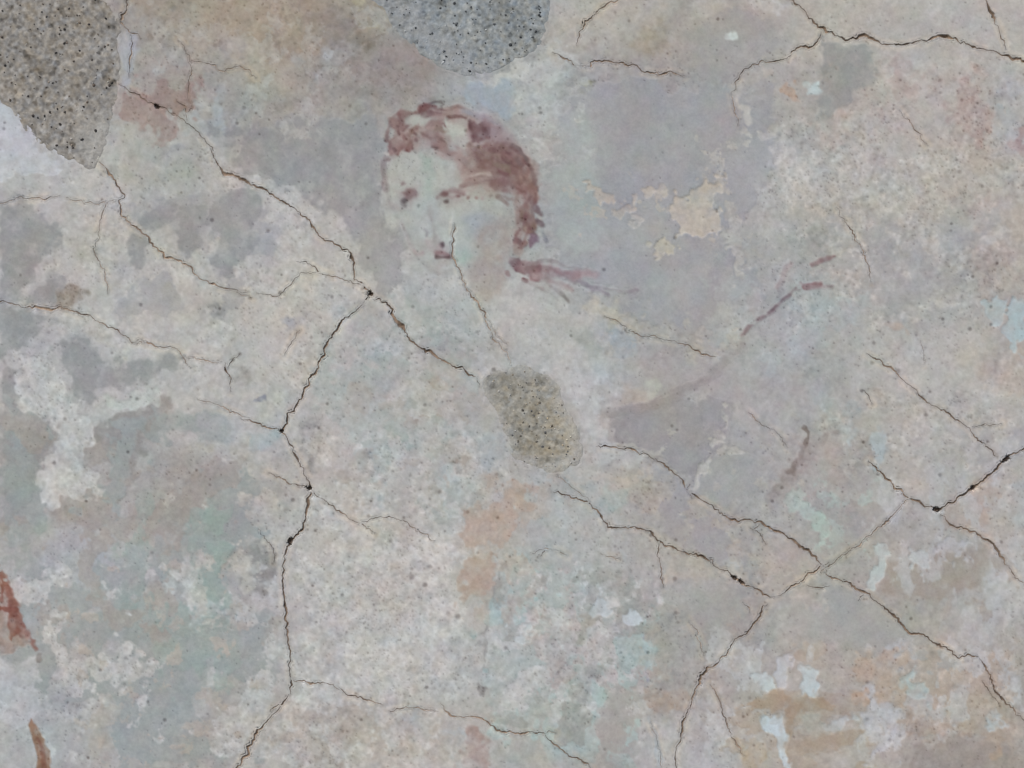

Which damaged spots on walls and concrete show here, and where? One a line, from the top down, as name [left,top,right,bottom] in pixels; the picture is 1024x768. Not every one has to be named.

spalling [0,0,126,183]
spalling [372,0,553,82]
crack [551,0,685,78]
crack [729,0,1024,126]
crack [898,109,929,147]
crack [835,206,873,282]
crack [0,0,592,768]
spalling [479,361,587,476]
crack [604,315,716,359]
crack [553,340,1024,768]
rust [0,564,43,663]